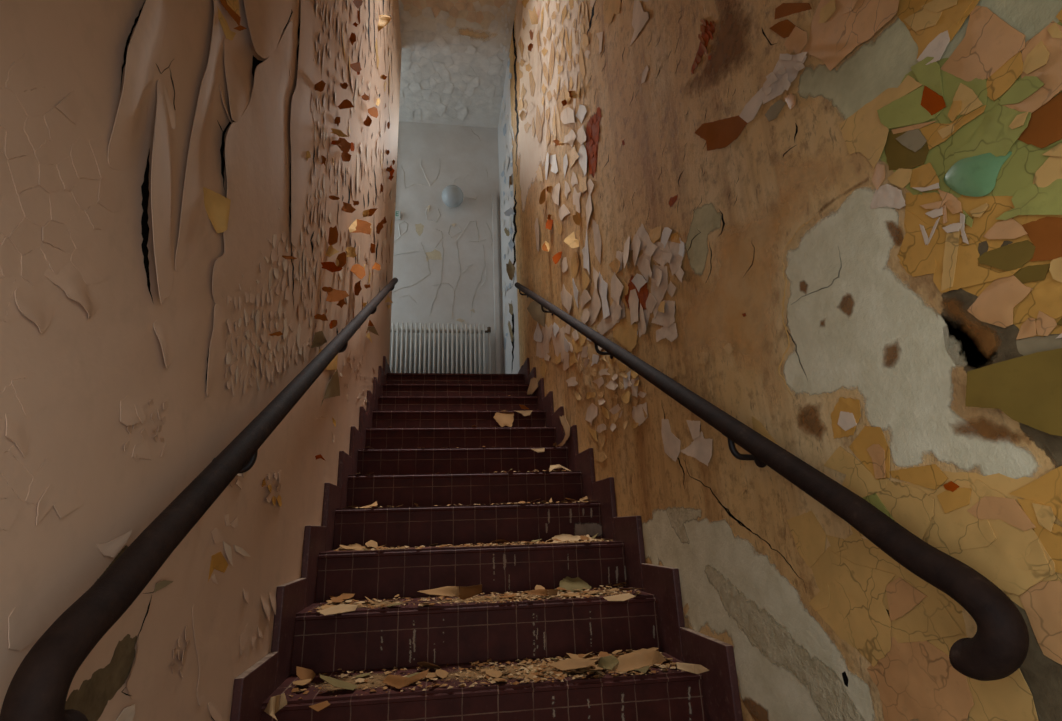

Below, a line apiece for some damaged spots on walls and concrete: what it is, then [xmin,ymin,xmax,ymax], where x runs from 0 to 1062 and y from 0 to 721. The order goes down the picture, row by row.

peeling [108,0,395,397]
peeling [493,0,685,462]
peeling [317,351,376,443]
flaking render [642,0,1062,721]
peeling [95,530,132,580]
flaking render [65,580,173,721]
peeling [498,576,641,601]